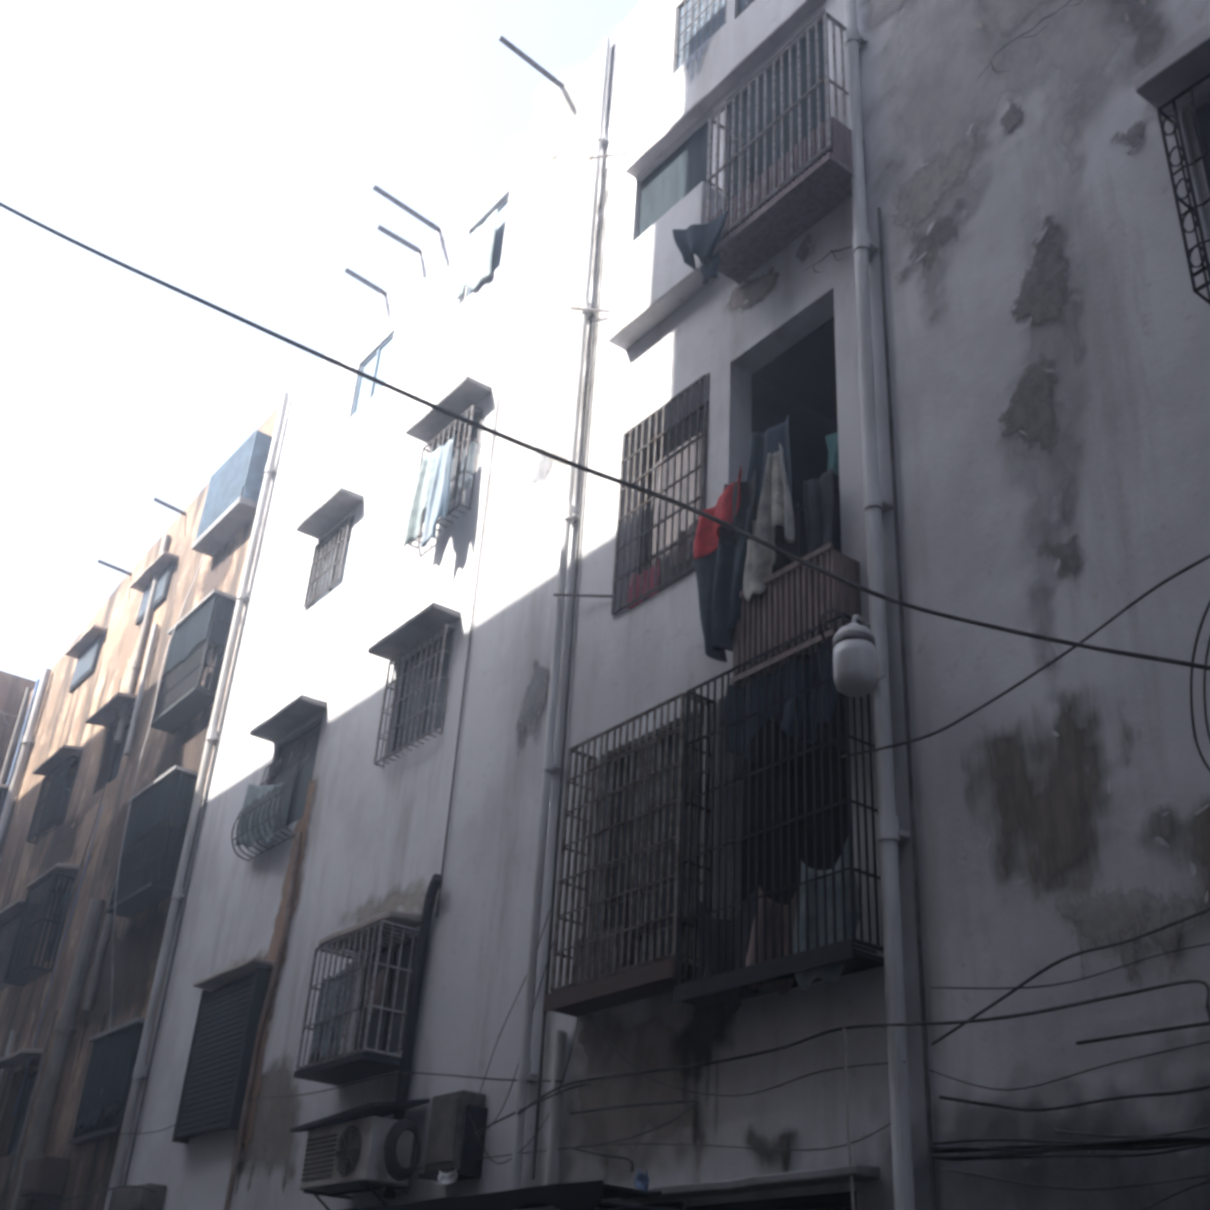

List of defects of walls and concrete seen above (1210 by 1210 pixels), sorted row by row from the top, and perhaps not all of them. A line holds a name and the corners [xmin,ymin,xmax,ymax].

water stain [890,0,1155,238]
water stain [303,0,670,494]
corrosion [232,778,316,1163]
water stain [578,1003,732,1167]
water stain [1056,888,1207,981]